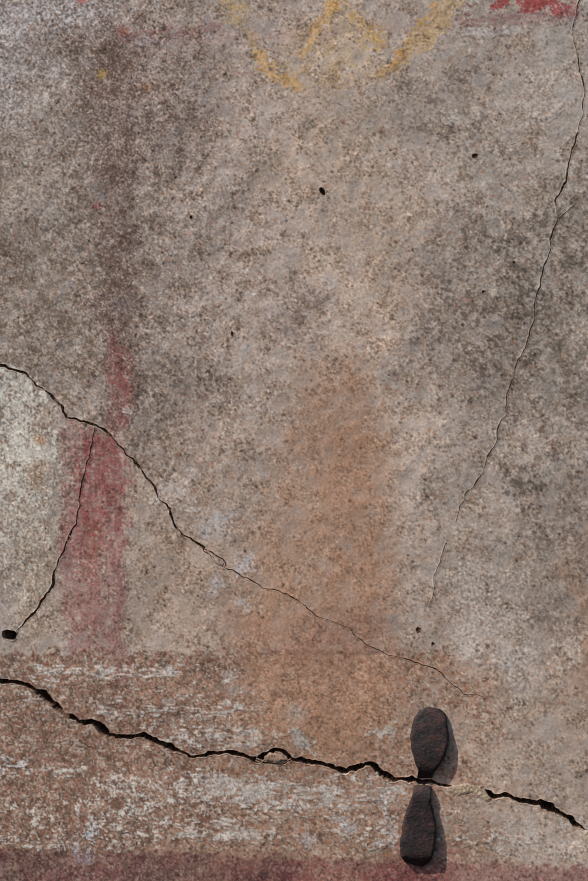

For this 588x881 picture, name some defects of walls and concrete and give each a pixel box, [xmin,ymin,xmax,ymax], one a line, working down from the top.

crack [455,0,587,522]
crack [0,363,485,700]
crack [0,677,588,841]